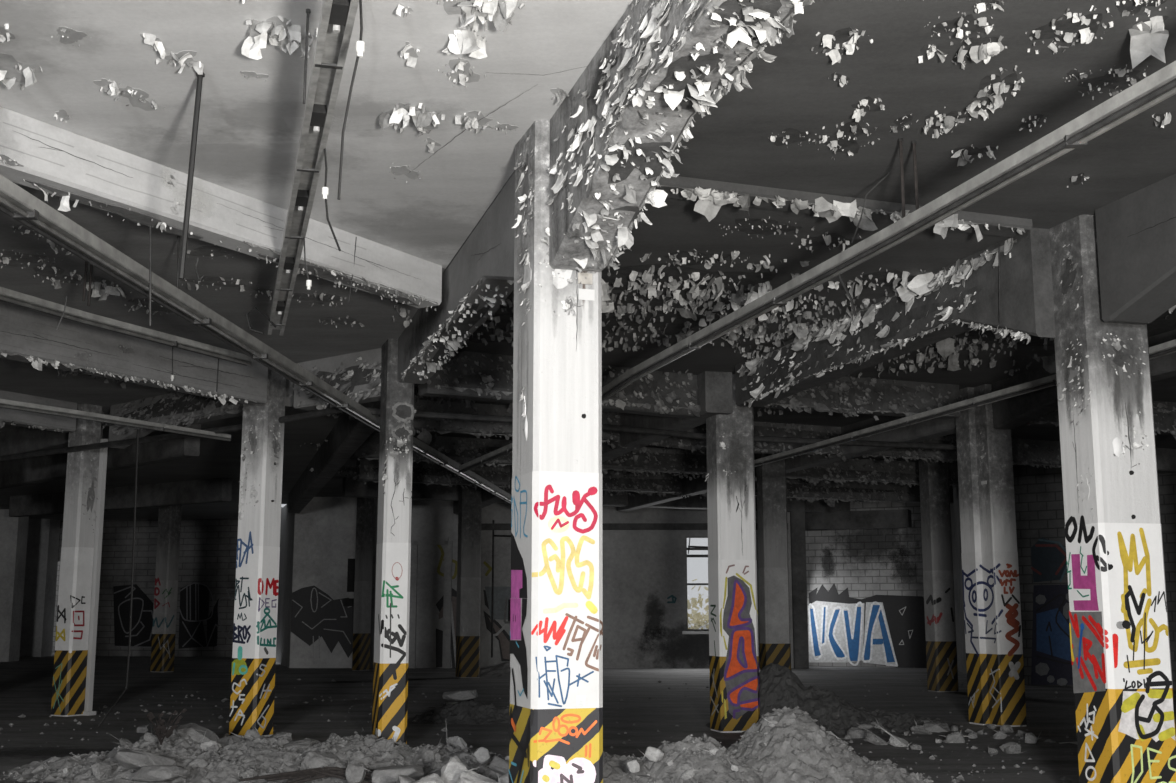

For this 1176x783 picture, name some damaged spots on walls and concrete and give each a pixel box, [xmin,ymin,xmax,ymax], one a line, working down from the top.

peeling [0,23,43,90]
peeling [51,26,87,46]
peeling [93,78,165,111]
peeling [239,15,318,81]
peeling [768,0,1025,160]
peeling [951,144,998,167]
peeling [1025,0,1169,99]
peeling [1152,112,1171,128]
peeling [289,0,910,499]
peeling [0,350,257,435]
peeling [709,214,1176,507]
peeling [238,418,282,514]